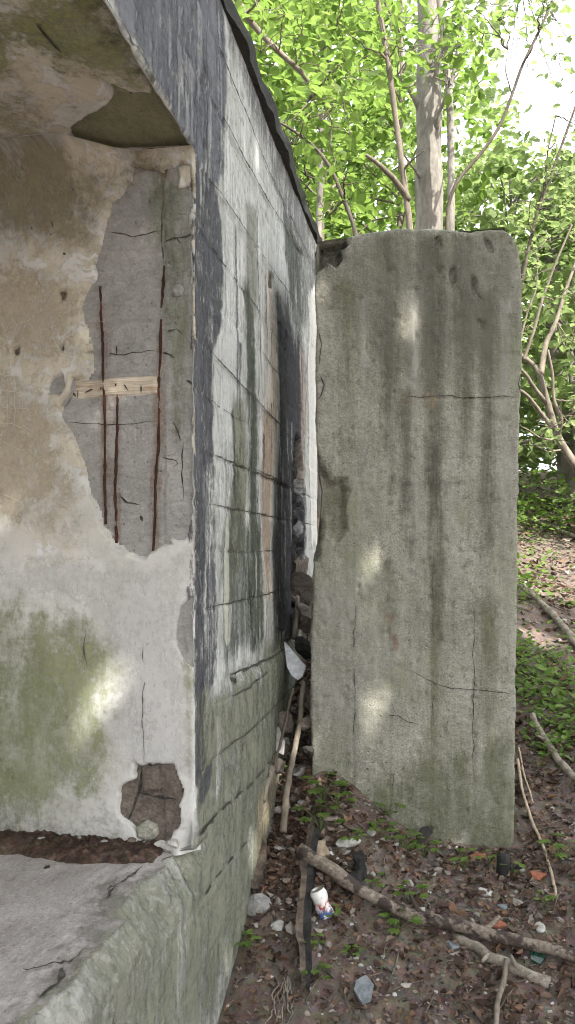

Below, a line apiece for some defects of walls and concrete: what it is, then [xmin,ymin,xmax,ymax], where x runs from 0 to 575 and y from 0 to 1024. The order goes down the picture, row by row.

spalling [70,82,189,149]
spalling [49,161,198,556]
leakage [0,0,318,816]
leakage [401,235,469,658]
crack [400,375,521,404]
crack [389,617,514,774]
spalling [28,763,190,1024]